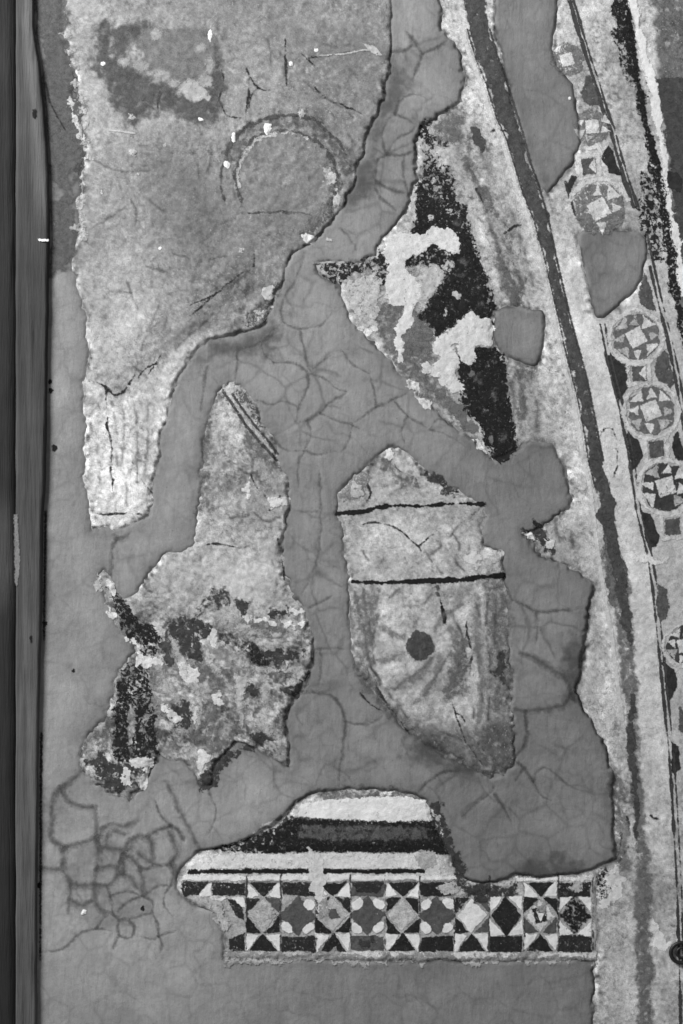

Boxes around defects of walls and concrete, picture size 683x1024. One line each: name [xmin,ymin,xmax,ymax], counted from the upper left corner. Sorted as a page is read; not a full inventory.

crack [216,39,361,118]
spalling [494,0,581,193]
crack [248,208,310,216]
crack [191,258,255,314]
spalling [577,198,665,318]
spalling [493,305,546,367]
crack [89,355,161,557]
crack [363,483,441,551]
peeling [158,616,306,687]
peeling [83,729,139,794]
peeling [160,690,228,772]
crack [39,732,197,959]